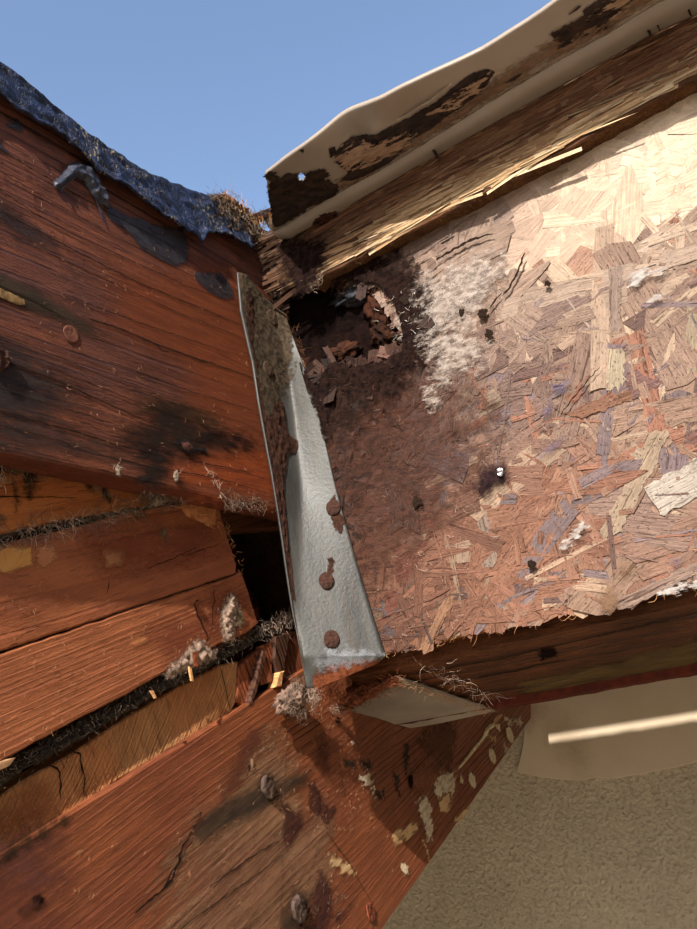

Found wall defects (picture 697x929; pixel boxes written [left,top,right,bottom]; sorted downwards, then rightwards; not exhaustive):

crack [490,253,525,308]
water stain [324,249,506,586]
water stain [179,452,273,495]
rust [331,512,345,533]
peeling [415,772,456,843]
crack [135,811,203,914]
crack [181,841,281,929]